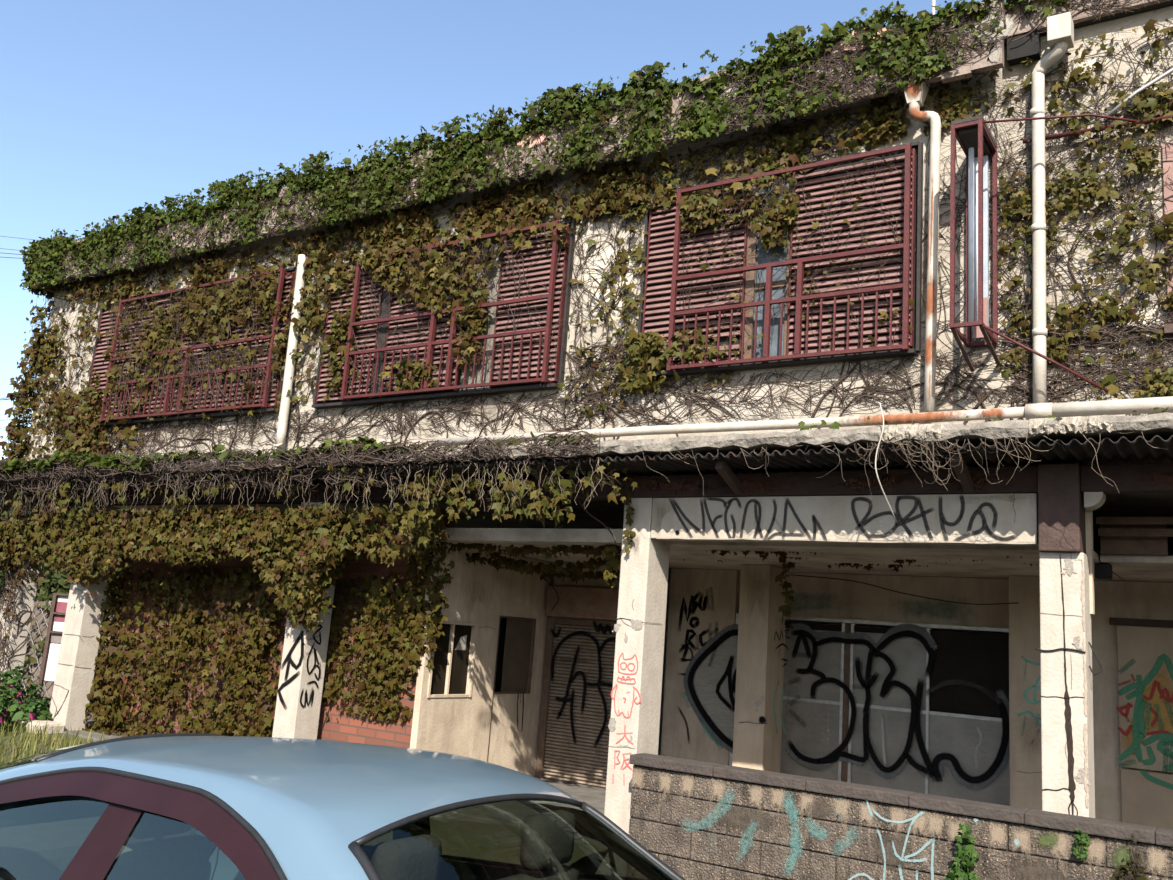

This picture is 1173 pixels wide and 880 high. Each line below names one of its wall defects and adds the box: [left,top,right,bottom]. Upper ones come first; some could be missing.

corrosion [905,77,927,121]
corrosion [926,281,936,316]
corrosion [924,336,936,364]
corrosion [855,411,953,424]
crack [1017,552,1085,816]